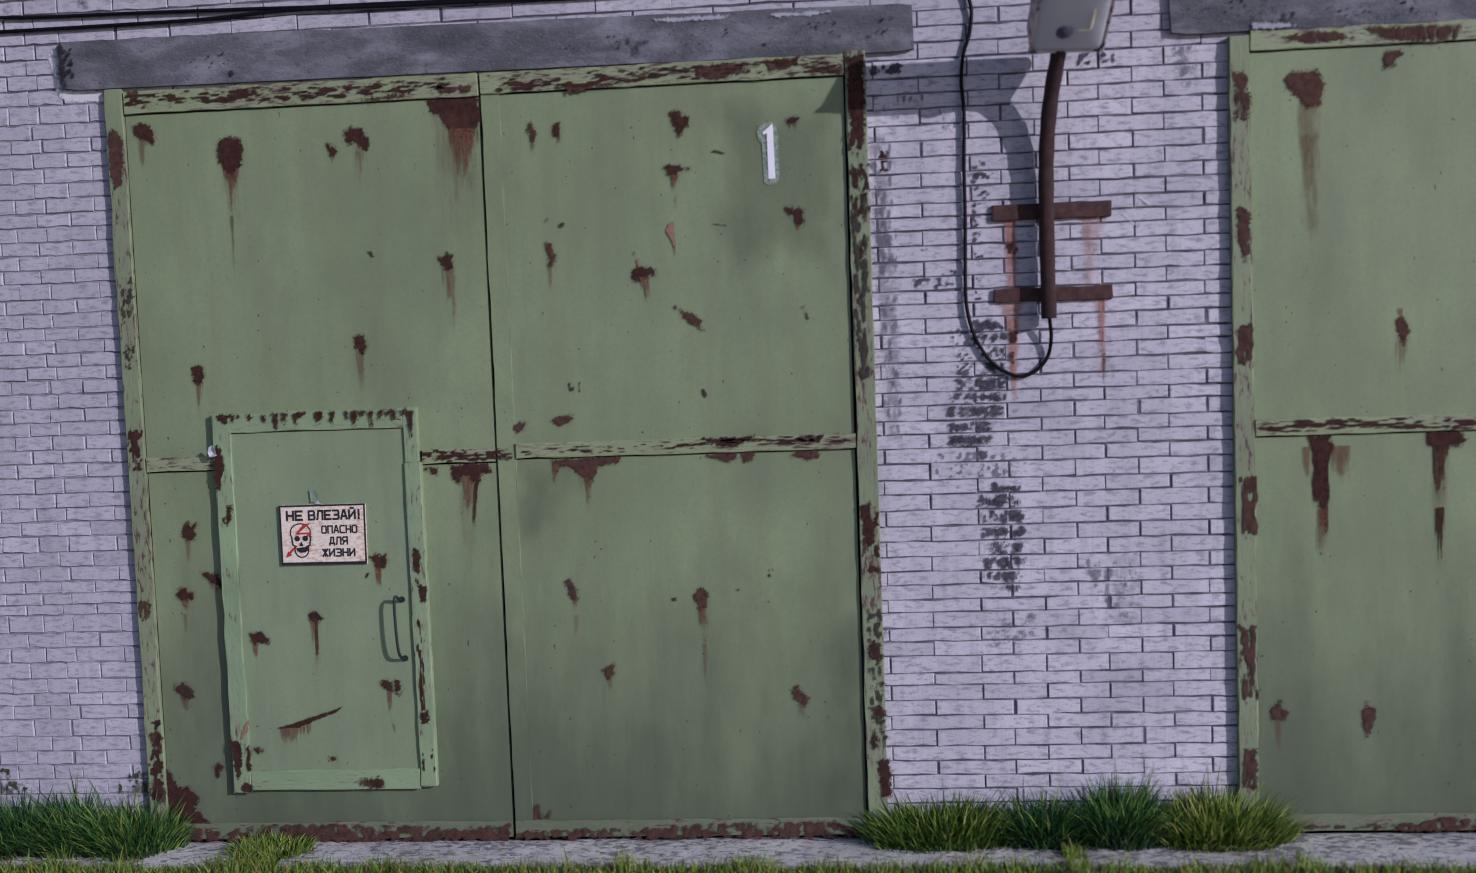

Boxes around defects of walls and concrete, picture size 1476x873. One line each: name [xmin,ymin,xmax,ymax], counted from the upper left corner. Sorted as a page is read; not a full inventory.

corrosion [217,135,244,204]
corrosion [426,96,481,172]
corrosion [846,54,867,151]
corrosion [1285,68,1326,109]
corrosion [216,409,414,438]
corrosion [425,462,492,523]
corrosion [552,455,621,498]
corrosion [1304,434,1350,541]
corrosion [1427,431,1466,558]
corrosion [860,500,880,573]
corrosion [868,609,893,798]
corrosion [166,770,869,843]